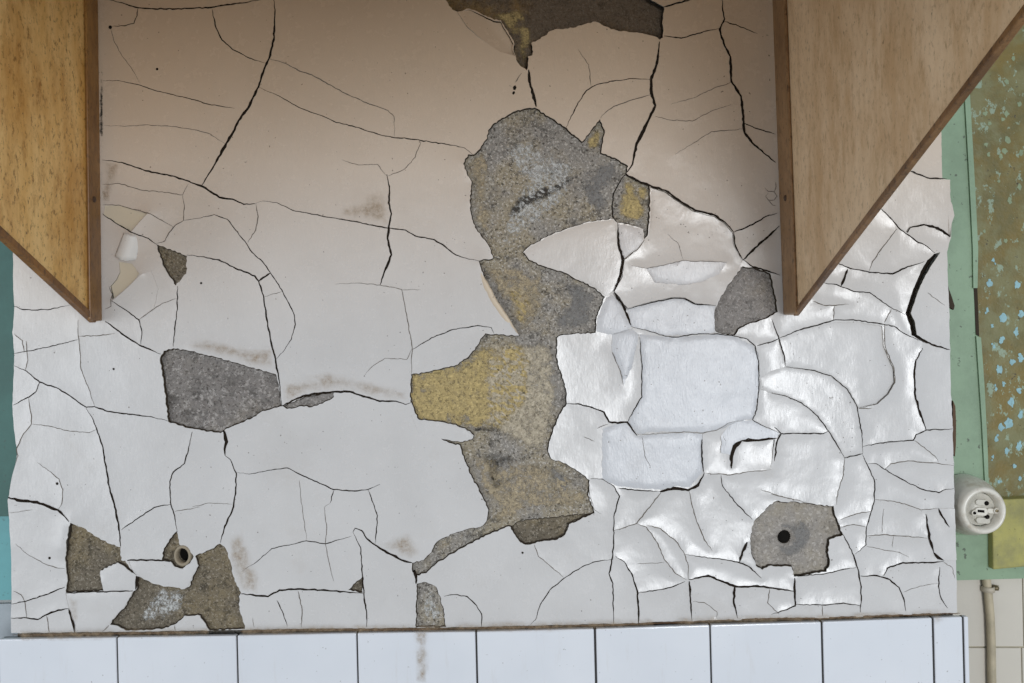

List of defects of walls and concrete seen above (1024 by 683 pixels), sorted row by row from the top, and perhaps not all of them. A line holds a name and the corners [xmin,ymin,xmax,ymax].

crack [528,70,537,107]
spalling [446,0,664,95]
crack [103,0,494,406]
peeling [104,205,187,319]
crack [531,0,955,624]
spalling [714,267,778,335]
spalling [160,348,334,433]
spalling [410,108,650,628]
crack [8,286,417,632]
spalling [65,524,245,632]
spalling [740,501,843,577]